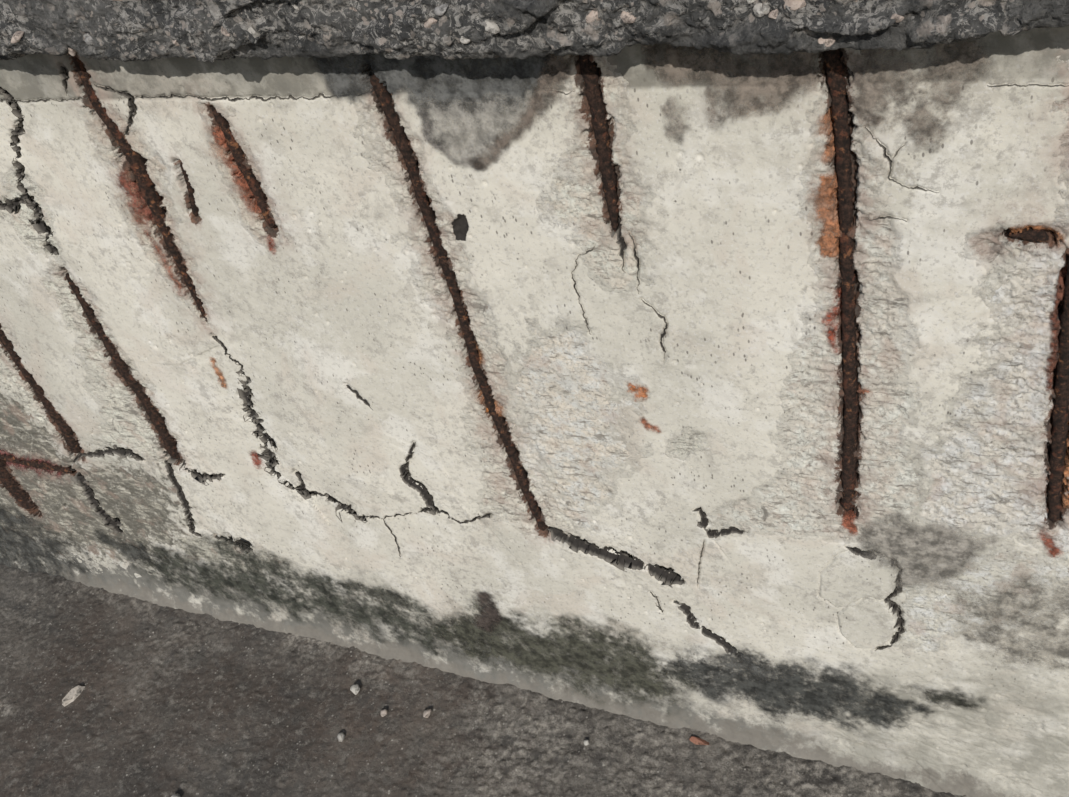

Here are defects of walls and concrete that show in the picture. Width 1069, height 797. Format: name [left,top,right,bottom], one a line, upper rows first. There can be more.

corrosion [116,171,187,296]
corrosion [211,122,262,213]
leakage [313,53,570,170]
crack [571,216,667,358]
corrosion [814,172,840,258]
spalling [707,37,1069,658]
corrosion [1046,263,1068,391]
crack [212,336,491,556]
leakage [0,509,85,577]
leakage [95,530,981,729]
crack [846,547,905,650]
leakage [859,513,990,585]